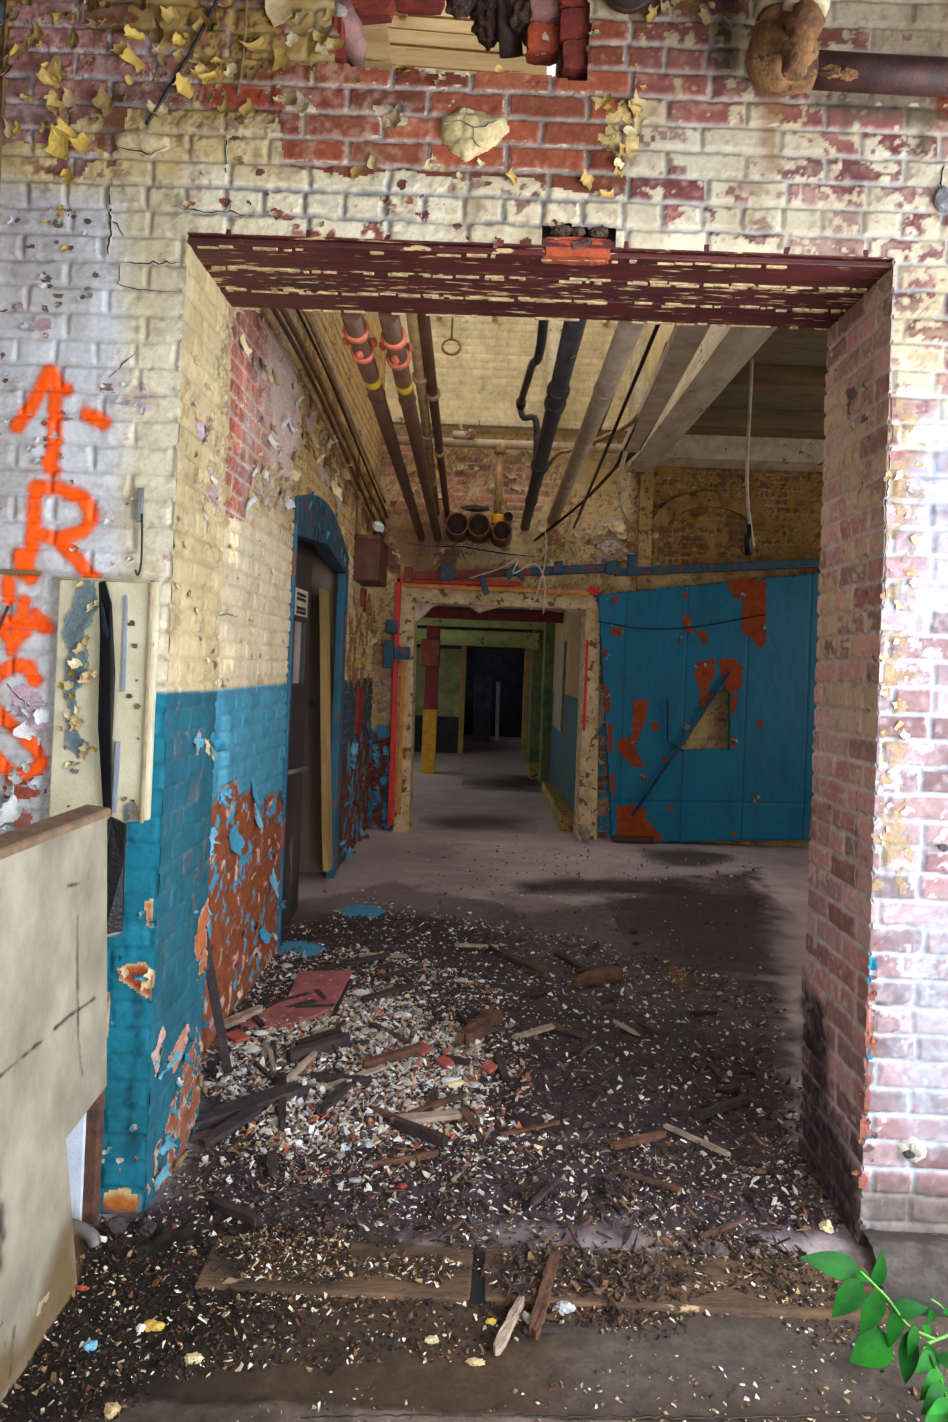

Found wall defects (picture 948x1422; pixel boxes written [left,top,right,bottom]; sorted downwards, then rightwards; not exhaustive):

flaking render [0,0,748,230]
spalling [493,219,615,265]
crack [937,165,945,189]
peeling [9,580,99,774]
flaking render [0,760,51,835]
peeling [102,777,286,1195]